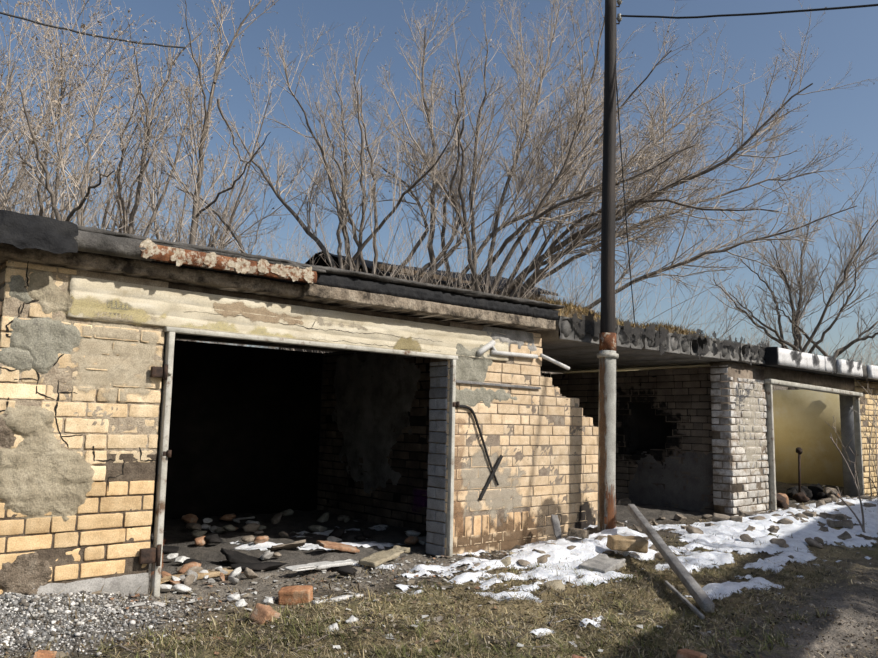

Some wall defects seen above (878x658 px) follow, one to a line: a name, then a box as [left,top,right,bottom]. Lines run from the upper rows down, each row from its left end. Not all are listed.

peeling [213,302,303,325]
crack [0,354,83,448]
spalling [0,414,16,449]
spalling [0,550,53,596]